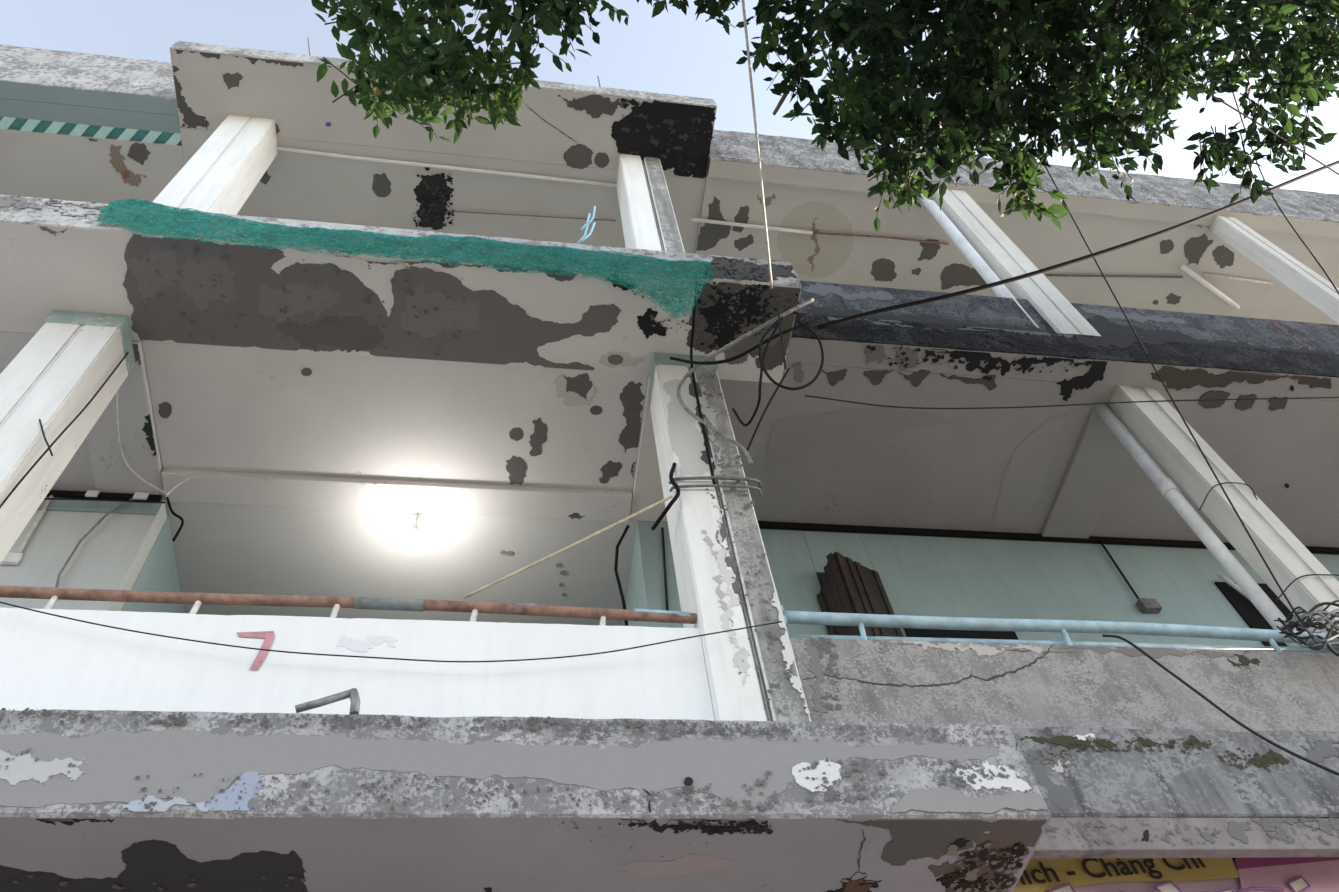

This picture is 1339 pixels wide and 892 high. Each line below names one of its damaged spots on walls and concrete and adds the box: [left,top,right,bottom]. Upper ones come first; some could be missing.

peeling [199,250,581,356]
spalling [132,324,159,365]
spalling [607,355,623,365]
spalling [822,369,847,386]
spalling [864,344,997,391]
peeling [771,590,810,715]
crack [801,645,1082,687]
peeling [0,748,86,786]
peeling [792,758,904,805]
peeling [923,758,1032,792]
spalling [827,871,882,892]
spalling [928,829,1030,892]